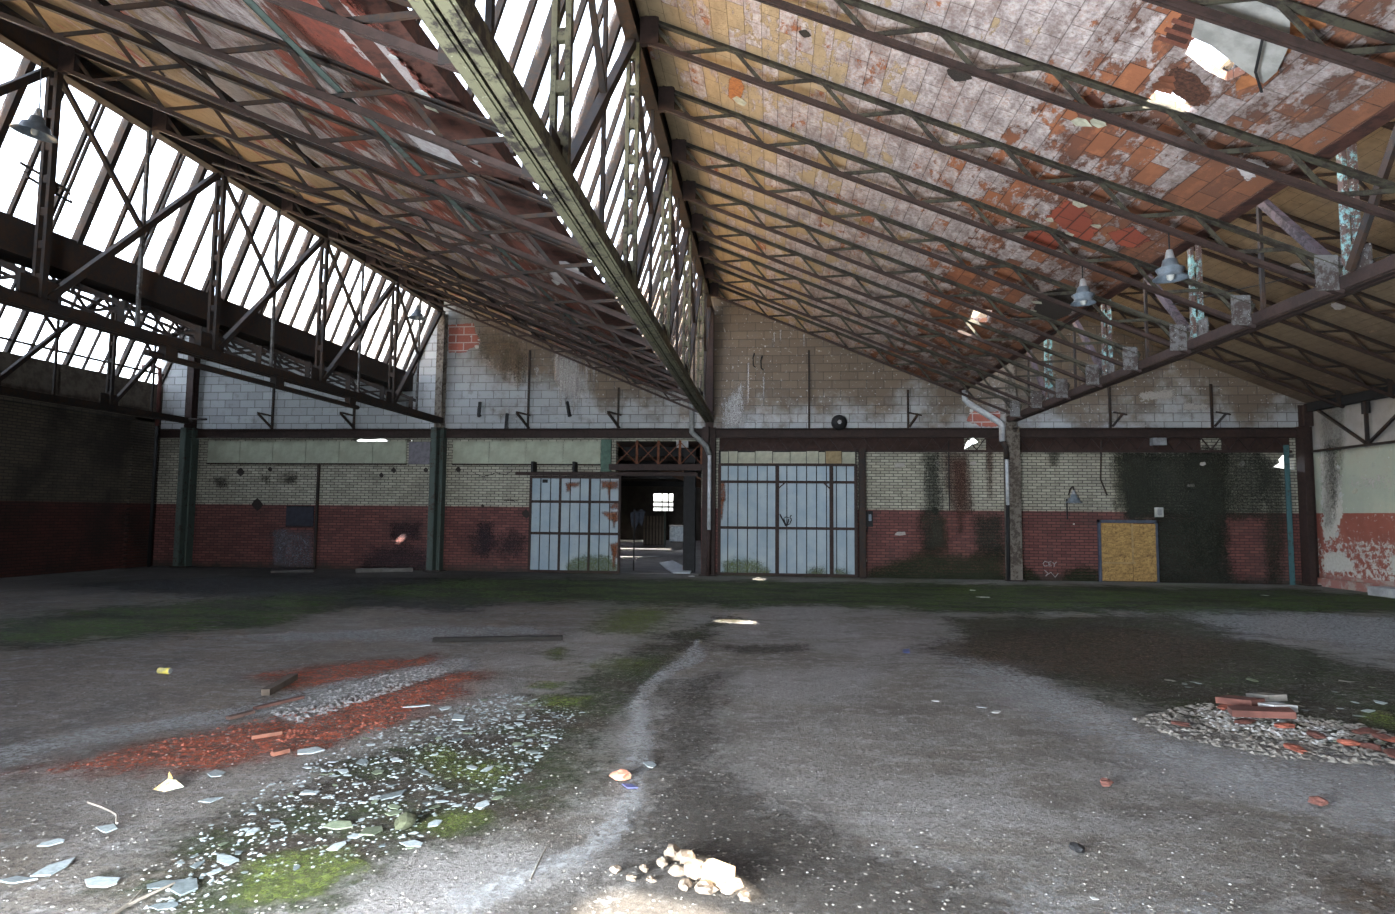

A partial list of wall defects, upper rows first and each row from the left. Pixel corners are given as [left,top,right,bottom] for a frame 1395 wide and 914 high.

spalling [1157,13,1195,49]
spalling [1235,15,1326,91]
spalling [1152,67,1210,110]
peeling [1071,117,1107,128]
water stain [536,354,595,413]
peeling [1319,447,1395,576]